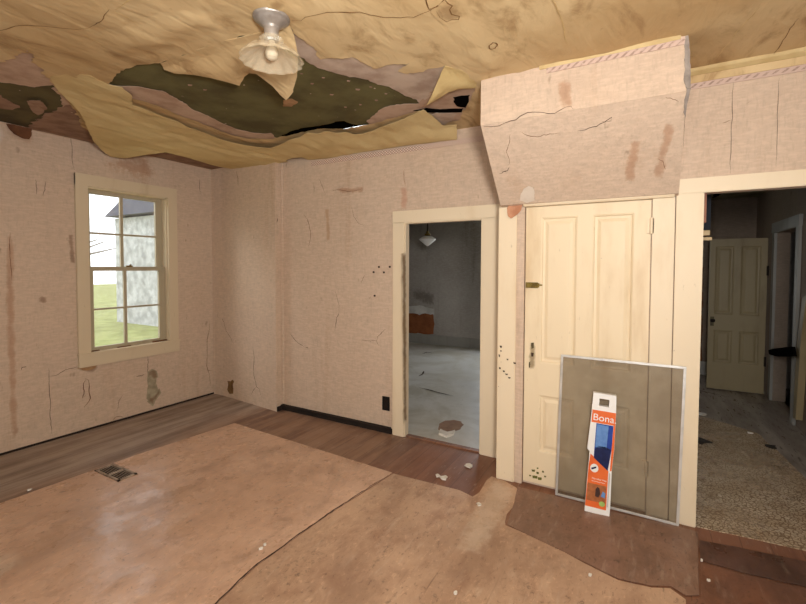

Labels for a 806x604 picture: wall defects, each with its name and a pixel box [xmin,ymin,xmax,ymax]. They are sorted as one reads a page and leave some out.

crack [488,106,570,174]
flaking render [409,305,434,315]
peeling [527,341,537,370]
flaking render [146,369,161,406]